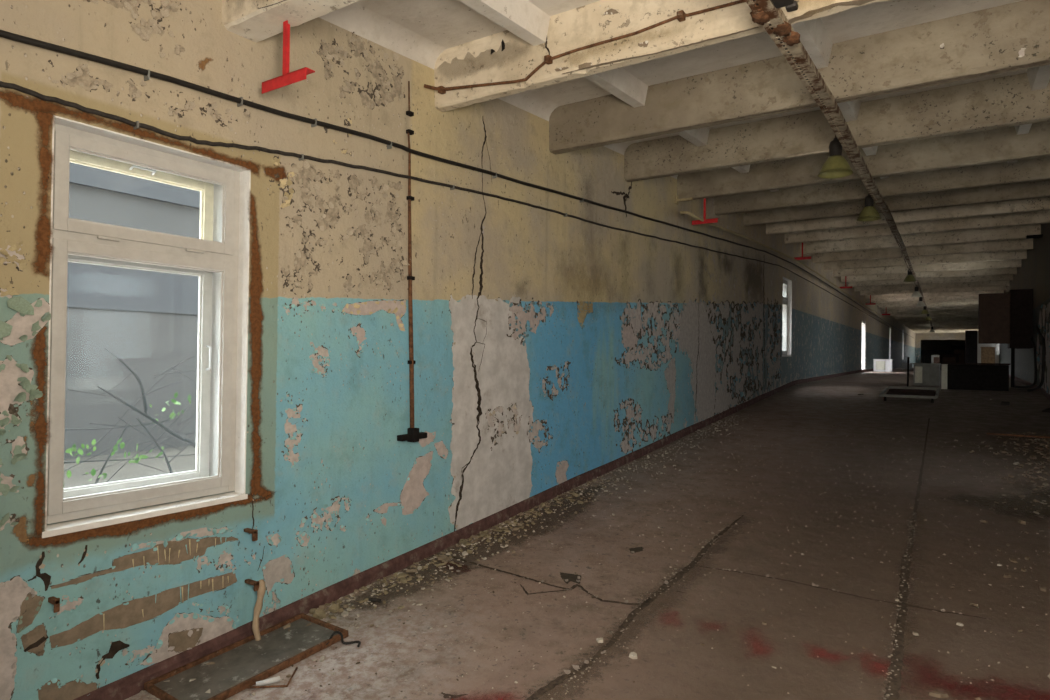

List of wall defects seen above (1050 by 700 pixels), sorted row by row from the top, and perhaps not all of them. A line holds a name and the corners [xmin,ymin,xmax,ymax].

spalling [554,27,759,74]
spalling [788,0,874,24]
peeling [0,281,51,496]
peeling [269,156,410,358]
flaking render [366,294,571,530]
crack [454,121,492,531]
crack [611,182,632,217]
peeling [613,298,783,454]
flaking render [0,526,295,700]
peeling [296,495,352,547]
crack [445,418,992,700]